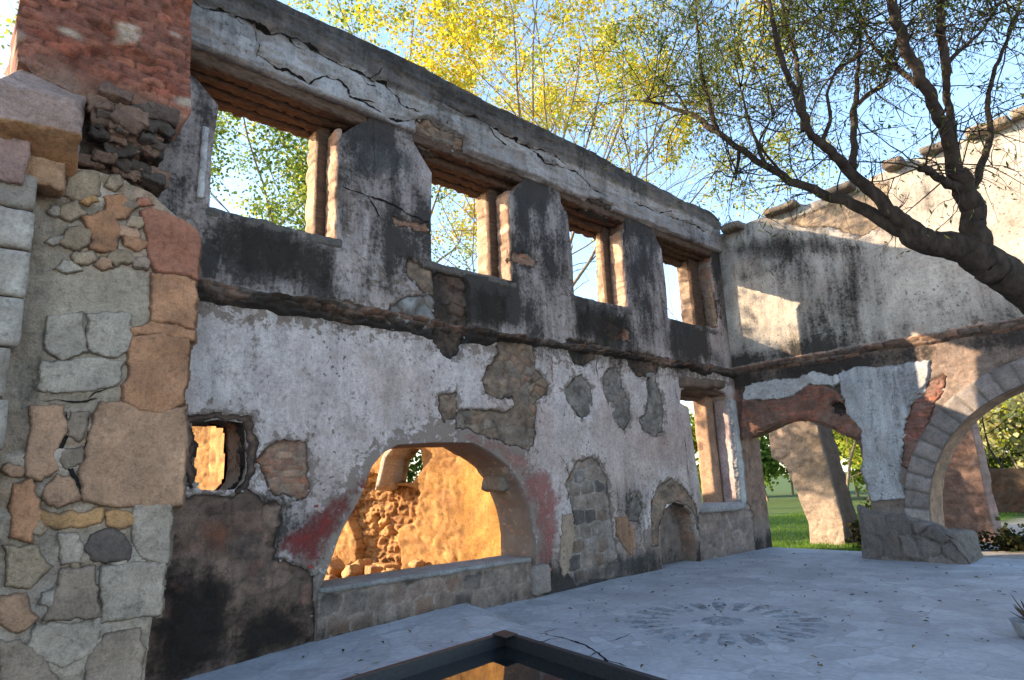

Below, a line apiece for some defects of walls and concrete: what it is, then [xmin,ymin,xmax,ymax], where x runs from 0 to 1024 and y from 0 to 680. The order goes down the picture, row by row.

damp [355,140,412,200]
crack [194,1,705,232]
damp [737,238,861,327]
spalling [438,341,548,452]
spalling [565,328,664,437]
flaking render [522,359,947,587]
spalling [144,412,421,680]
damp [234,606,308,663]